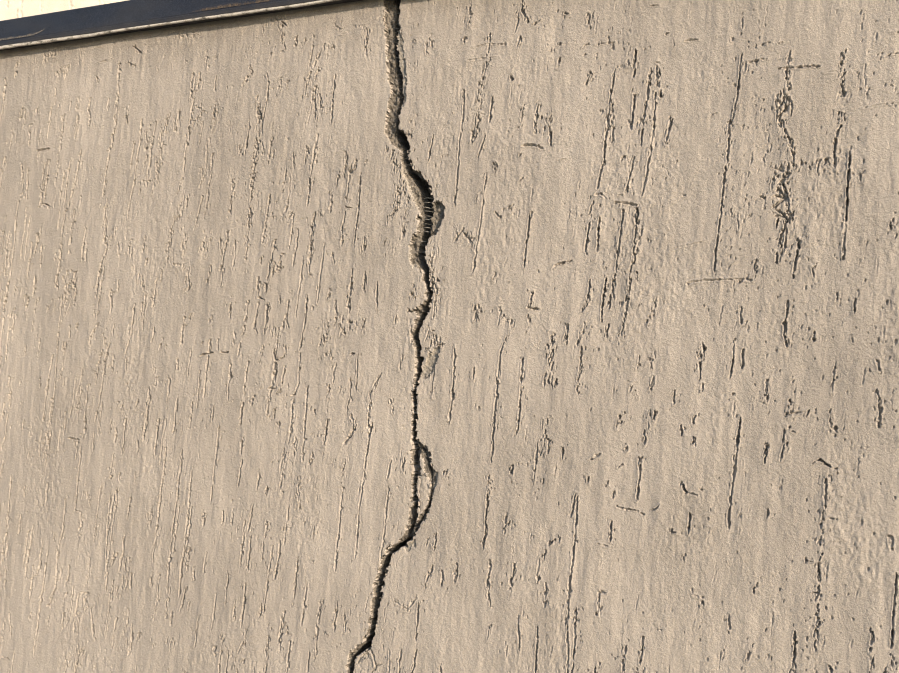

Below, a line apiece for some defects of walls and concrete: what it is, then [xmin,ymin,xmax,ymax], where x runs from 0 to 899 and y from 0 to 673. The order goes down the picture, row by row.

crack [346,0,446,673]